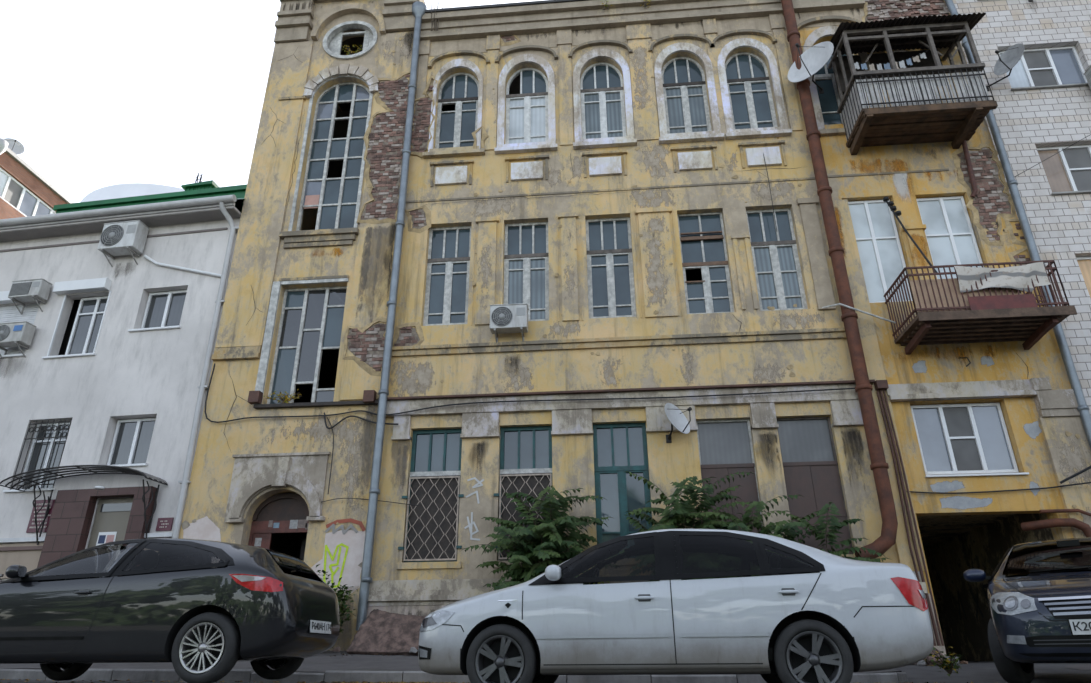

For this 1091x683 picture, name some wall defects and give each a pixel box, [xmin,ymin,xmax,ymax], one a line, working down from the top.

flaking render [862,0,950,22]
flaking render [356,35,441,233]
flaking render [952,144,1032,266]
flaking render [343,316,444,397]
spalling [181,516,221,541]